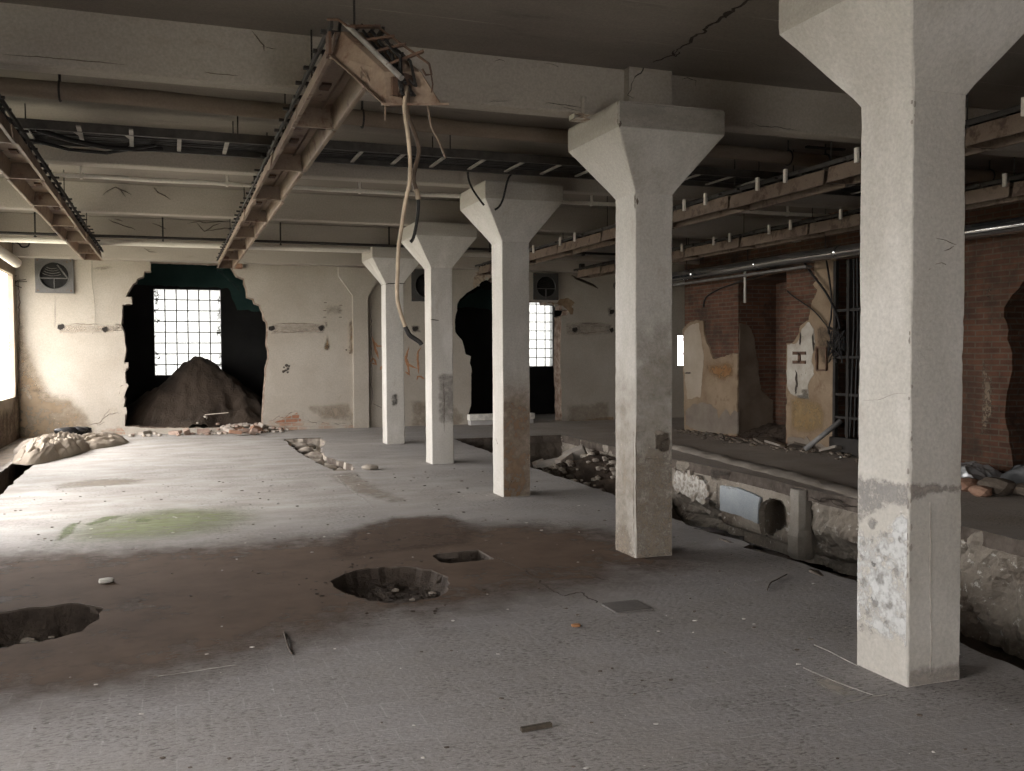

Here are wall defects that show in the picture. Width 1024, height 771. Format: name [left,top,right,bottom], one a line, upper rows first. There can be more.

crack [628,0,749,97]
flaking render [686,402,739,434]
peeling [858,469,912,529]